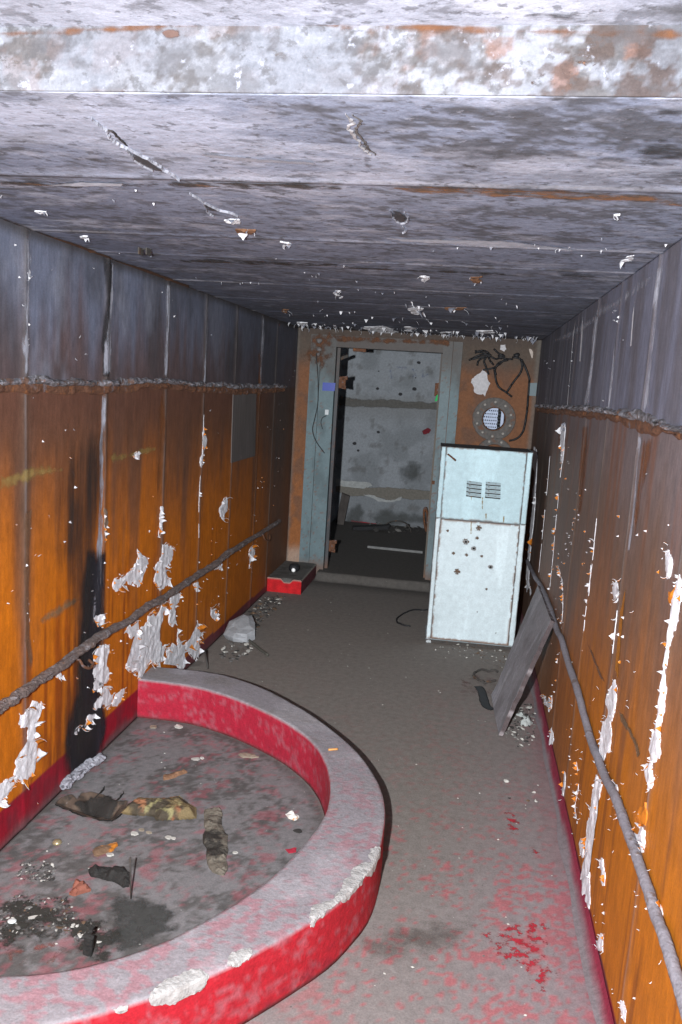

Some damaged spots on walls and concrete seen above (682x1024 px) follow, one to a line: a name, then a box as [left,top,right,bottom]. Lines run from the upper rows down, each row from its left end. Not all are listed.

rust [477,188,680,206]
damp [104,265,113,373]
peeling [282,276,538,351]
rust [0,375,287,410]
spalling [471,370,490,396]
damp [96,398,106,557]
rust [534,403,682,530]
peeling [55,496,233,735]
peeling [559,542,682,954]
spalling [309,846,381,927]
spalling [149,968,209,1006]
peeling [612,993,636,1023]